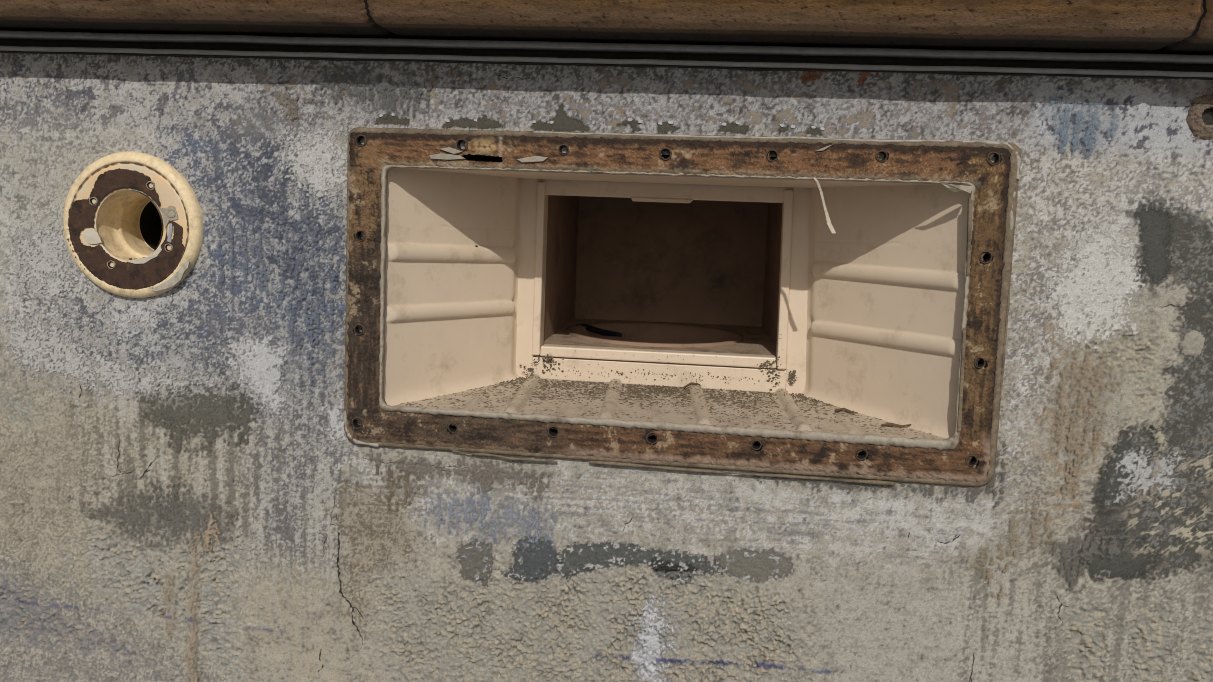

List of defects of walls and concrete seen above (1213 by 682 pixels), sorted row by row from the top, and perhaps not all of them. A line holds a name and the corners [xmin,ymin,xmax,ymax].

crack [1187,0,1207,38]
peeling [375,113,410,126]
peeling [442,115,503,129]
peeling [531,104,590,132]
peeling [617,118,679,134]
peeling [718,122,749,134]
peeling [779,124,825,136]
rust [1189,88,1213,139]
leakage [752,193,1213,600]
leakage [88,478,238,552]
crack [323,491,363,645]